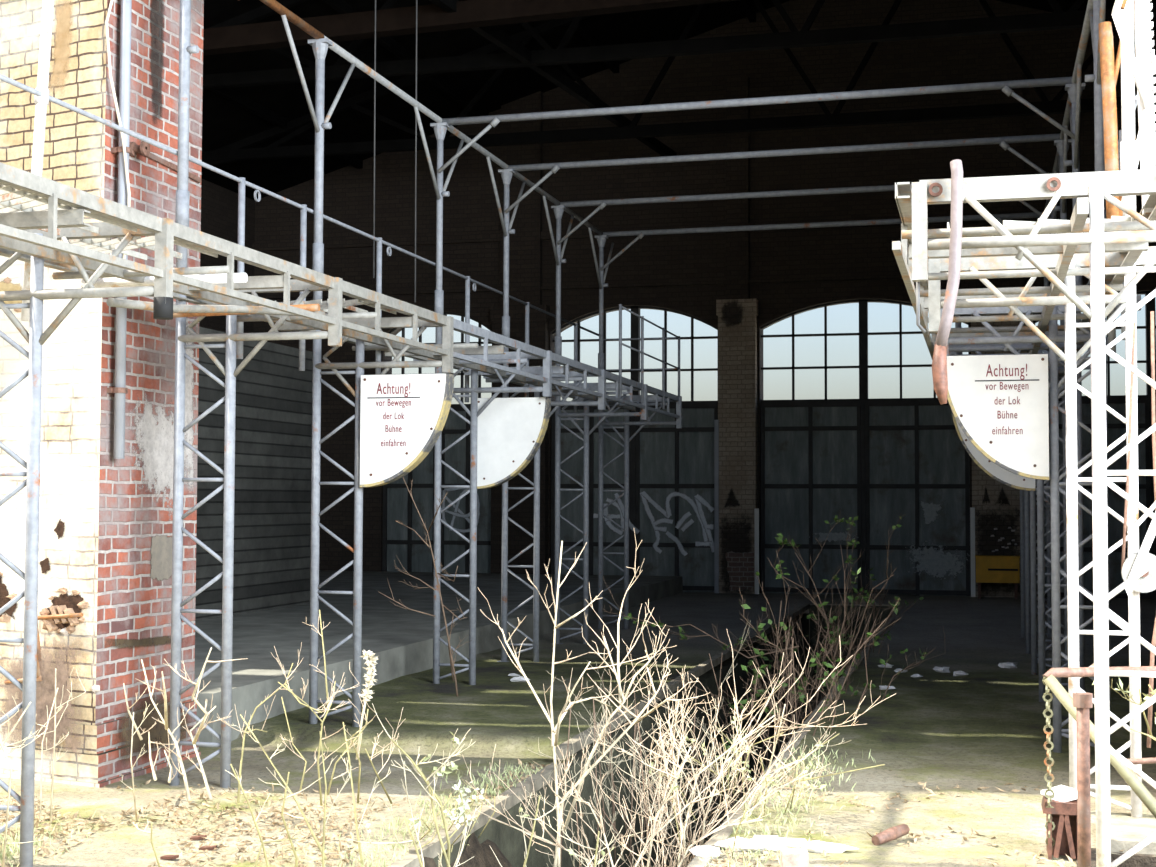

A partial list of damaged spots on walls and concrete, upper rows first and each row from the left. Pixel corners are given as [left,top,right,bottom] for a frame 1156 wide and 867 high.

spalling [54,519,65,539]
spalling [0,572,18,622]
spalling [39,587,88,634]